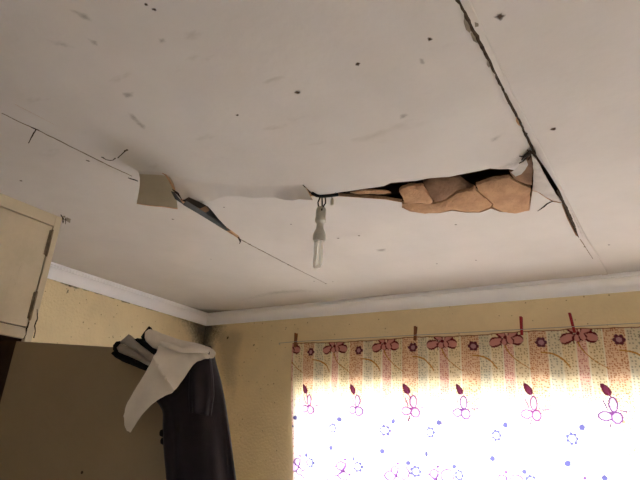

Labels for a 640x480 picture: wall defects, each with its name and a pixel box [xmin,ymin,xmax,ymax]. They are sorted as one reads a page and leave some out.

crack [455,0,536,154]
crack [2,113,138,182]
crack [538,190,593,259]
crack [238,237,324,283]